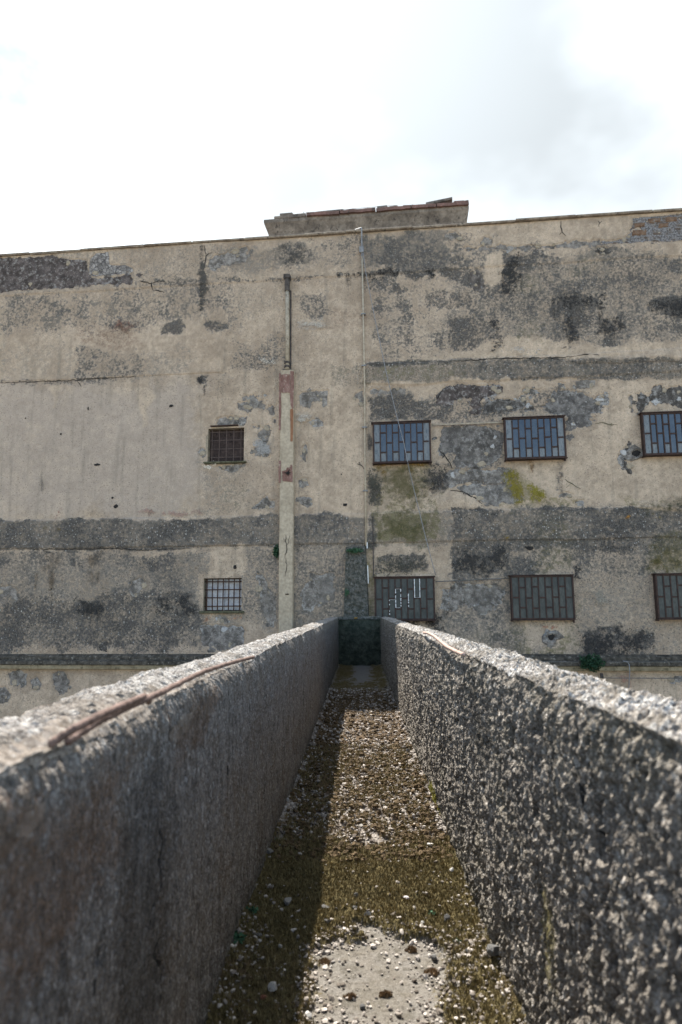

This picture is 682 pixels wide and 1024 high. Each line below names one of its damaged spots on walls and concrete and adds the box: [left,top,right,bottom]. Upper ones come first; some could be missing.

spalling [445,214,682,255]
crack [89,252,165,293]
leakage [197,246,209,311]
leakage [336,268,402,283]
leakage [499,251,522,294]
leakage [552,291,626,348]
peeling [617,441,635,474]
leakage [367,468,385,506]
leakage [451,544,510,577]
leakage [73,596,104,615]
leakage [403,608,449,631]
leakage [579,625,649,655]